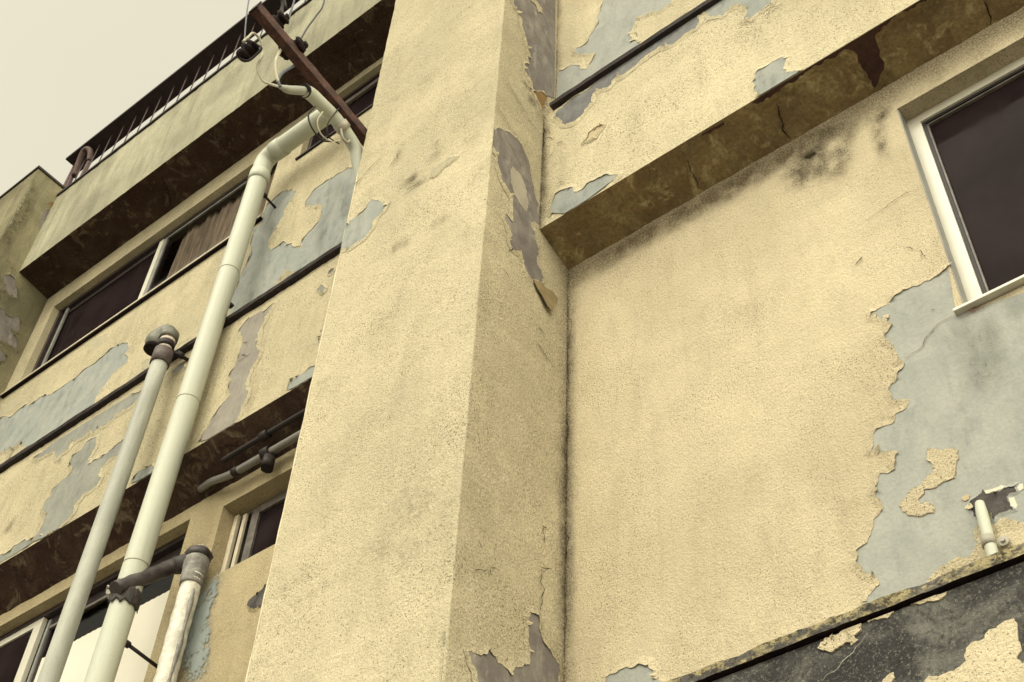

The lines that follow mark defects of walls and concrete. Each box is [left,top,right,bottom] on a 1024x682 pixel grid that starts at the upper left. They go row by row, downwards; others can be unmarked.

peeling [198,164,391,441]
peeling [492,123,624,312]
peeling [511,0,777,128]
leakage [585,116,853,277]
crack [776,104,792,140]
peeling [0,330,151,562]
leakage [560,334,573,632]
peeling [848,262,1024,603]
peeling [464,605,564,682]